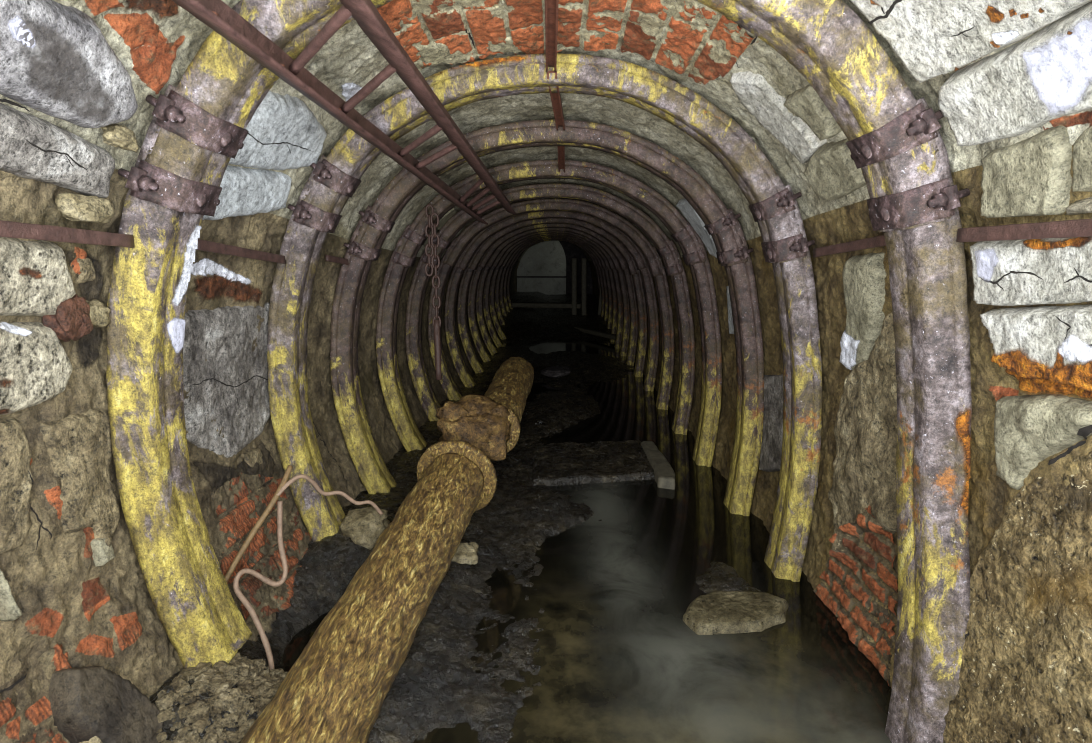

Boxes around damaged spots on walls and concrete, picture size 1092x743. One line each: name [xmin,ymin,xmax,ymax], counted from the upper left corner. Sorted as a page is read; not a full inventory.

crack [868,0,902,24]
flaking render [377,0,760,85]
efflorescence [1024,20,1092,111]
crack [0,99,30,112]
crack [27,140,88,172]
crack [980,268,1092,291]
corrosion [991,349,1092,399]
efflorescence [1059,336,1092,362]
corrosion [955,410,971,513]
flaking render [813,505,898,687]
flaking render [6,635,72,682]
flaking render [0,667,36,732]